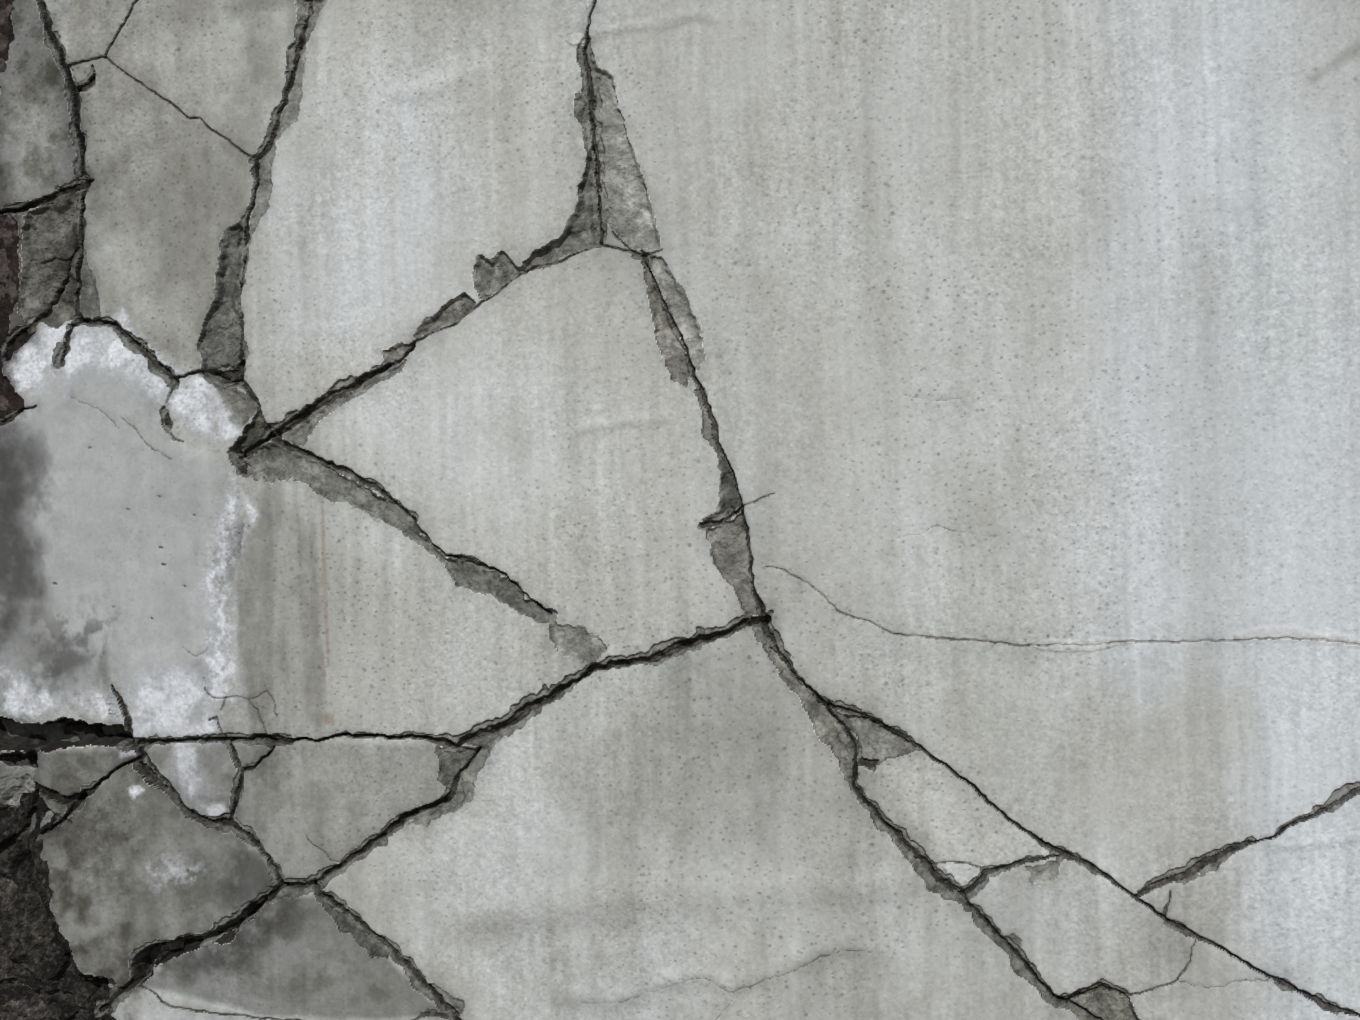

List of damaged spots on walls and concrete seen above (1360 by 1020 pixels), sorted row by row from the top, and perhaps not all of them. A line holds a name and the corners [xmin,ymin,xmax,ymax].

peeling [0,0,15,88]
spalling [0,192,101,419]
water stain [11,309,241,441]
crack [0,0,324,443]
crack [228,0,775,616]
spalling [371,48,705,388]
water stain [0,670,55,718]
spalling [0,716,132,1020]
water stain [73,479,258,795]
water stain [208,804,225,816]
crack [34,610,1360,1020]
crack [767,566,1360,653]